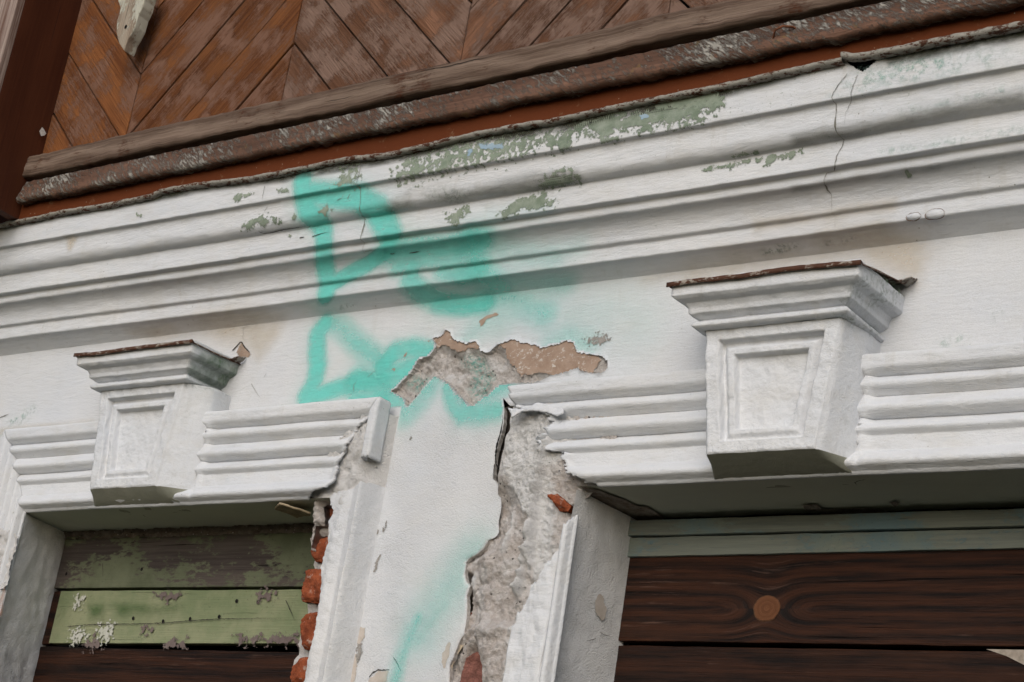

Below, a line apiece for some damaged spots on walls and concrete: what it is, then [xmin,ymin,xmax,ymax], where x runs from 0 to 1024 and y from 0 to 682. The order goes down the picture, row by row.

peeling [240,212,296,232]
peeling [442,203,471,227]
peeling [388,92,726,220]
peeling [701,147,804,172]
crack [824,74,857,228]
spalling [395,331,608,405]
spalling [275,414,399,682]
spalling [442,401,664,682]